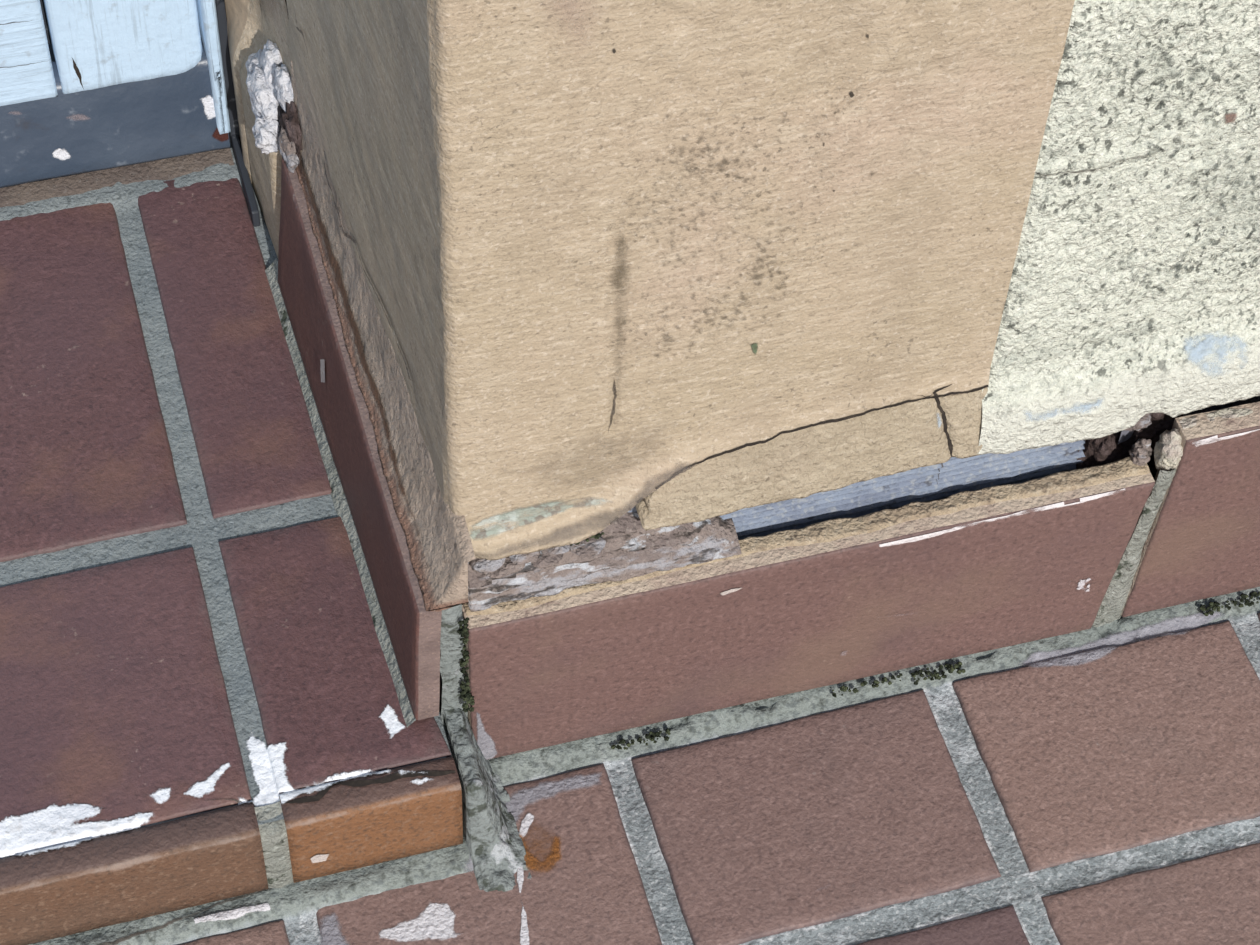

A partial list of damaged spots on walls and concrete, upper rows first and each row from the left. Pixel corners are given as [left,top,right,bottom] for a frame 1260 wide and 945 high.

crack [615,384,989,521]
flaking render [467,396,1260,612]